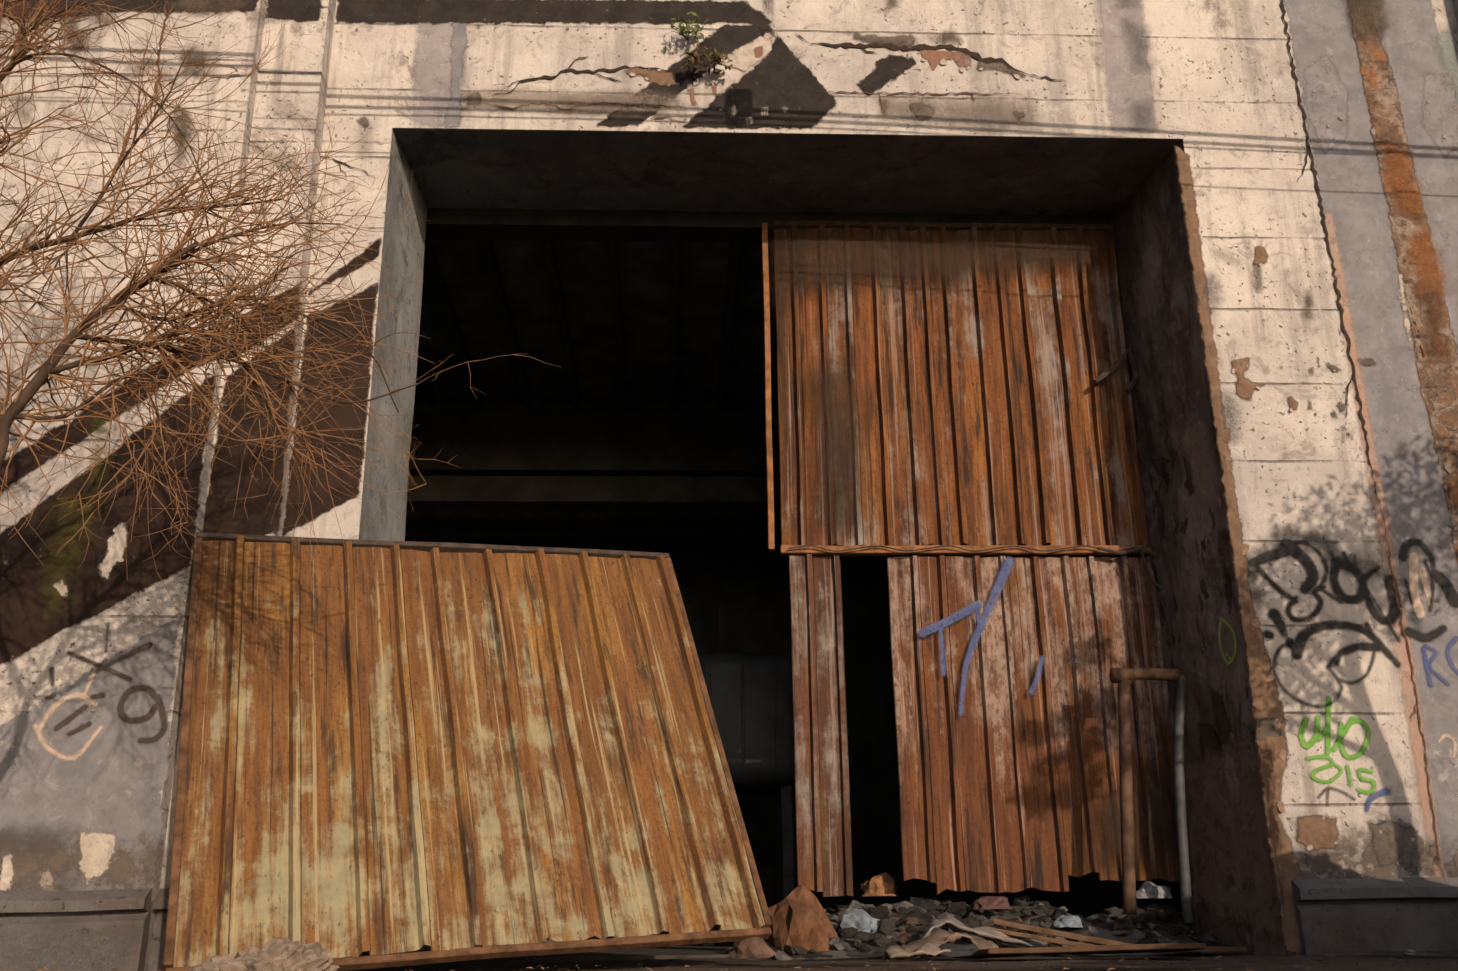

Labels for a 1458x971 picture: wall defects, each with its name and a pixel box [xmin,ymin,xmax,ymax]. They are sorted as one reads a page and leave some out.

crack [494,56,668,95]
crack [795,32,1065,113]
spalling [920,50,1026,79]
corrosion [1412,234,1451,363]
crack [1280,0,1445,877]